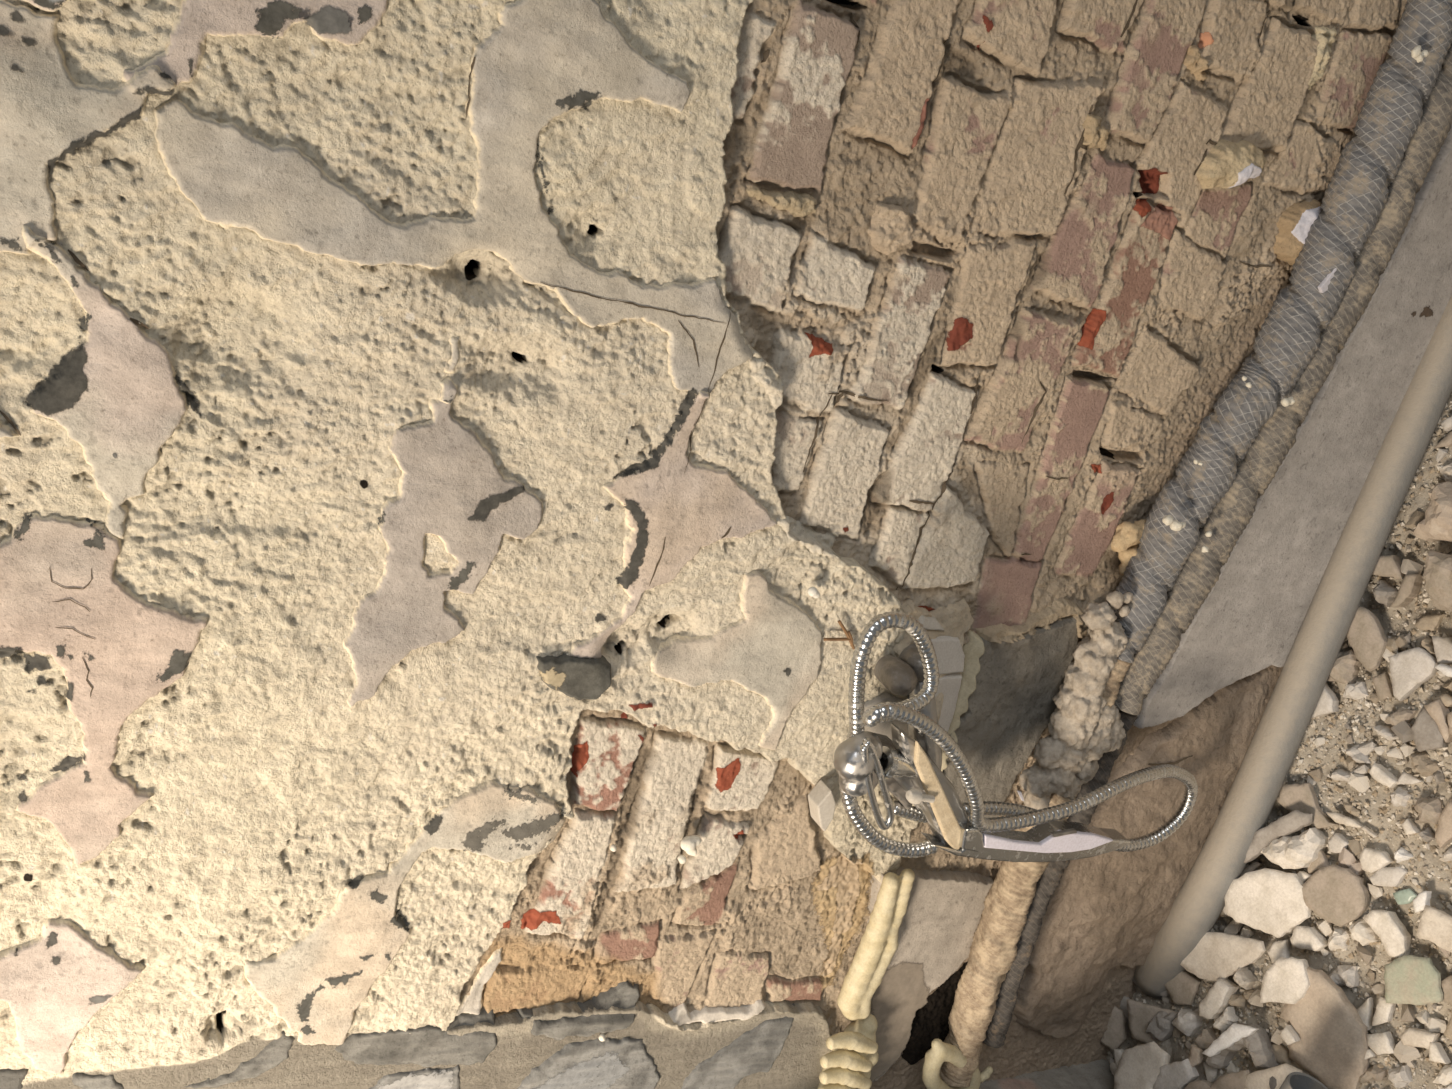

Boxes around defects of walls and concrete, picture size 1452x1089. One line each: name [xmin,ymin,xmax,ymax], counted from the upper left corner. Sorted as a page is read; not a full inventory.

spalling [1411,306,1433,317]
flaking render [0,0,1407,865]
crack [896,462,955,590]
flaking render [243,571,872,1045]
flaking render [899,822,1002,881]
flaking render [978,966,1137,1083]